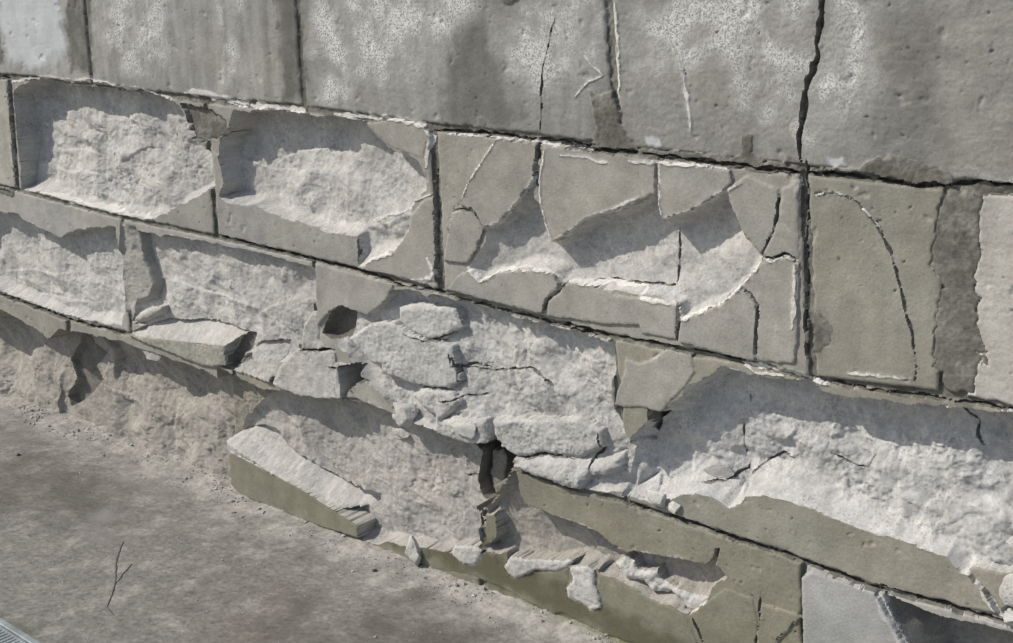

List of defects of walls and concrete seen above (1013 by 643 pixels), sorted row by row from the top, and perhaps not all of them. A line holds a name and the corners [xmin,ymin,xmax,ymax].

crack [533,18,556,192]
spalling [13,78,439,282]
crack [433,163,485,281]
crack [541,280,569,313]
crack [599,228,682,286]
crack [674,315,682,340]
crack [743,290,760,355]
crack [761,1,918,386]
spalling [0,139,1013,643]